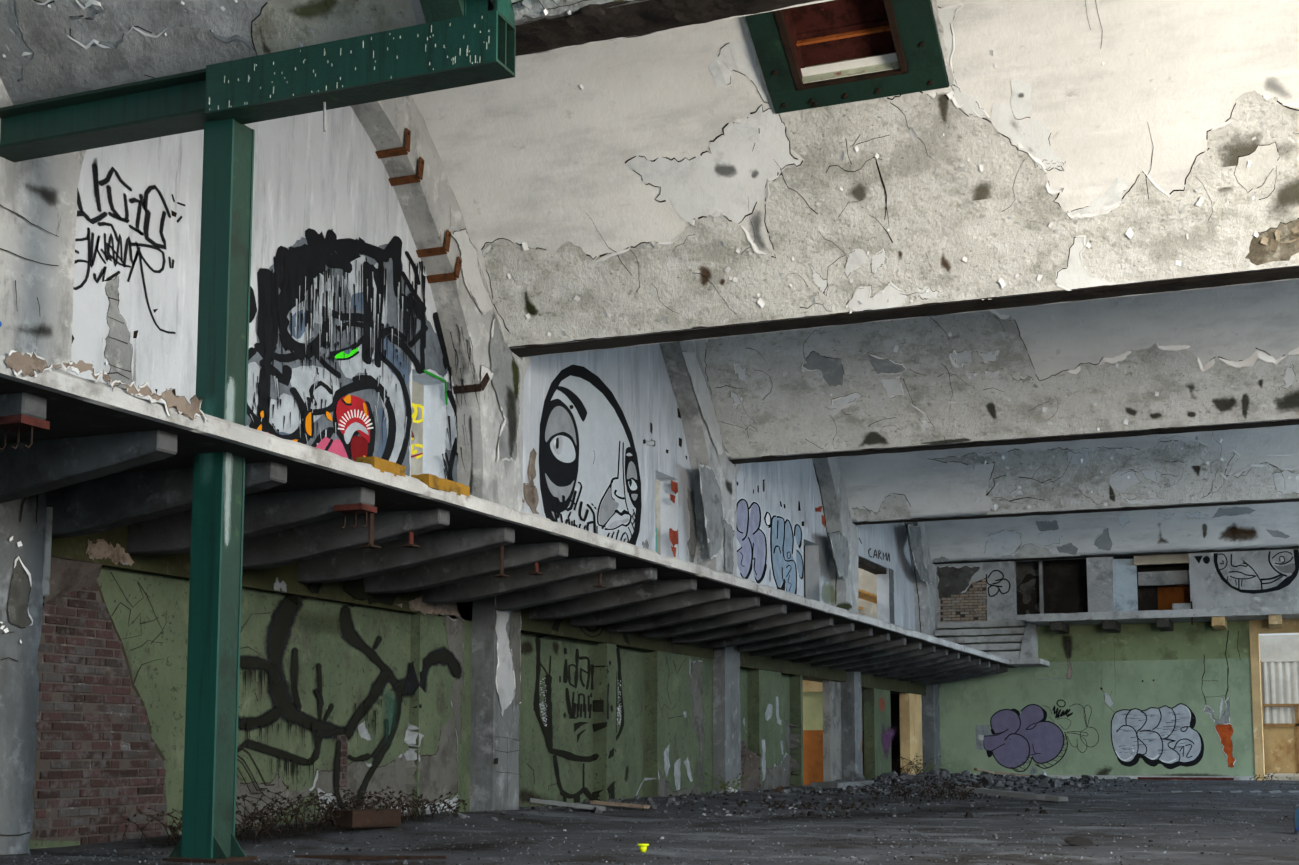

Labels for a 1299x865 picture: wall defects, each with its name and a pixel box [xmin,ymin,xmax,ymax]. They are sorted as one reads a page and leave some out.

spalling [103,274,138,395]
peeling [451,0,1299,633]
flaking render [0,536,168,845]
crack [110,572,167,684]
peeling [494,596,521,718]